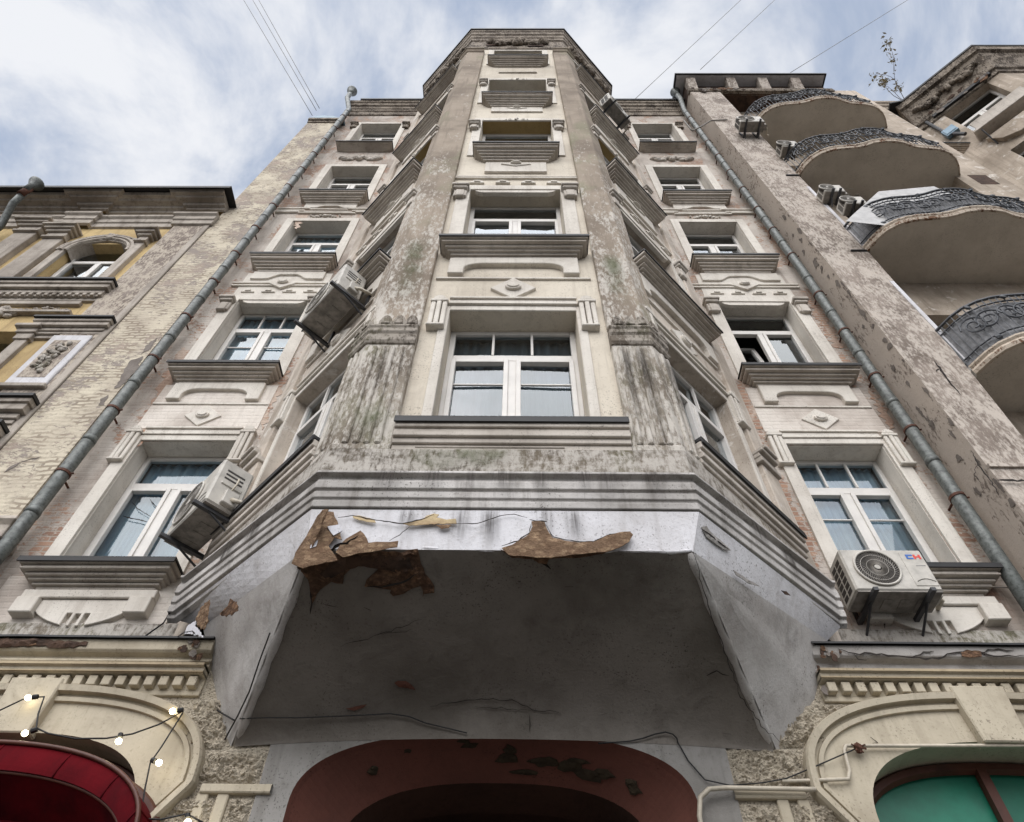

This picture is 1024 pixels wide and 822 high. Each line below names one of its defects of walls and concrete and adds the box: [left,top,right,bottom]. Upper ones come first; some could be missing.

flaking render [792,228,874,329]
flaking render [808,299,845,348]
peeling [98,337,158,405]
flaking render [867,384,895,430]
spalling [292,509,633,613]
spalling [175,598,239,661]
crack [839,623,1024,660]
peeling [495,744,643,796]